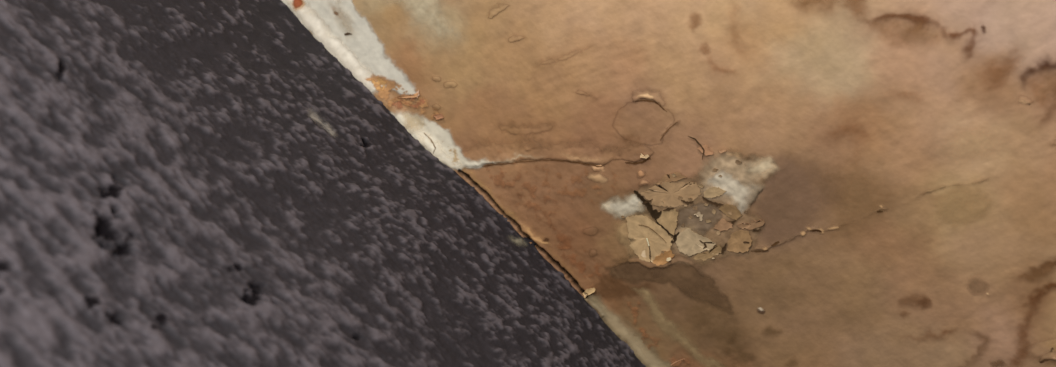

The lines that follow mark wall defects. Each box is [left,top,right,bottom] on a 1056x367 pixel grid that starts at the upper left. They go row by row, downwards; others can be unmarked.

leakage [875,14,930,34]
leakage [949,26,985,51]
leakage [1022,61,1056,80]
peeling [391,89,679,169]
spalling [602,136,777,270]
leakage [593,261,732,367]